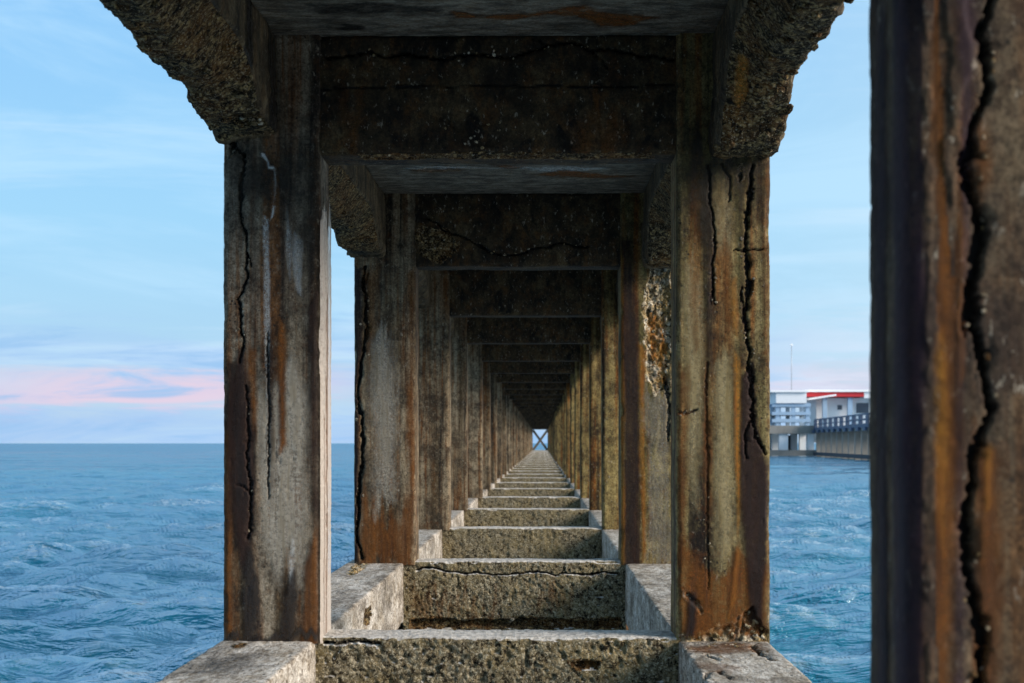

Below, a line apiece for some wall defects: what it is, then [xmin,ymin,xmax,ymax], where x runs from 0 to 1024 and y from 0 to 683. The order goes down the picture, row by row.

spalling [100,0,274,164]
spalling [712,0,854,160]
corrosion [224,431,233,638]
crack [235,147,274,532]
crack [355,266,370,559]
corrosion [355,266,414,565]
crack [416,566,618,577]
spalling [641,268,672,397]
corrosion [677,355,769,653]
crack [707,165,763,369]
crack [956,0,999,683]
corrosion [974,446,1001,683]